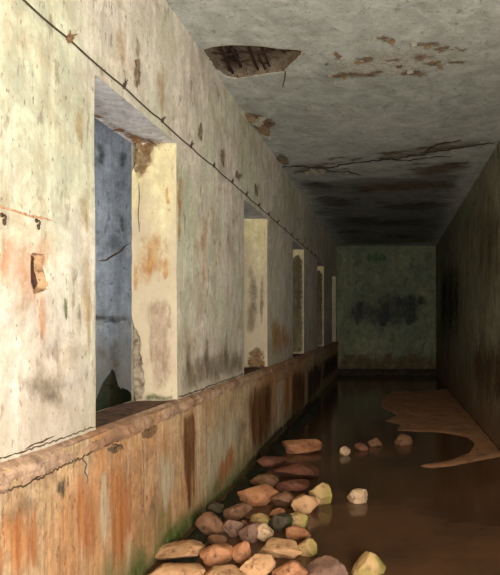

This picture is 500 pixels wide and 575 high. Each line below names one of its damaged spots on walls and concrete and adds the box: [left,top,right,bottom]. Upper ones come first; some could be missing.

spalling [202,45,303,87]
peeling [328,40,465,80]
spalling [245,113,275,141]
spalling [112,129,160,176]
crack [282,140,494,175]
water stain [312,163,466,244]
crack [97,243,130,262]
spalling [133,328,145,400]
spalling [248,348,265,368]
crack [0,426,96,459]
crack [0,443,124,494]